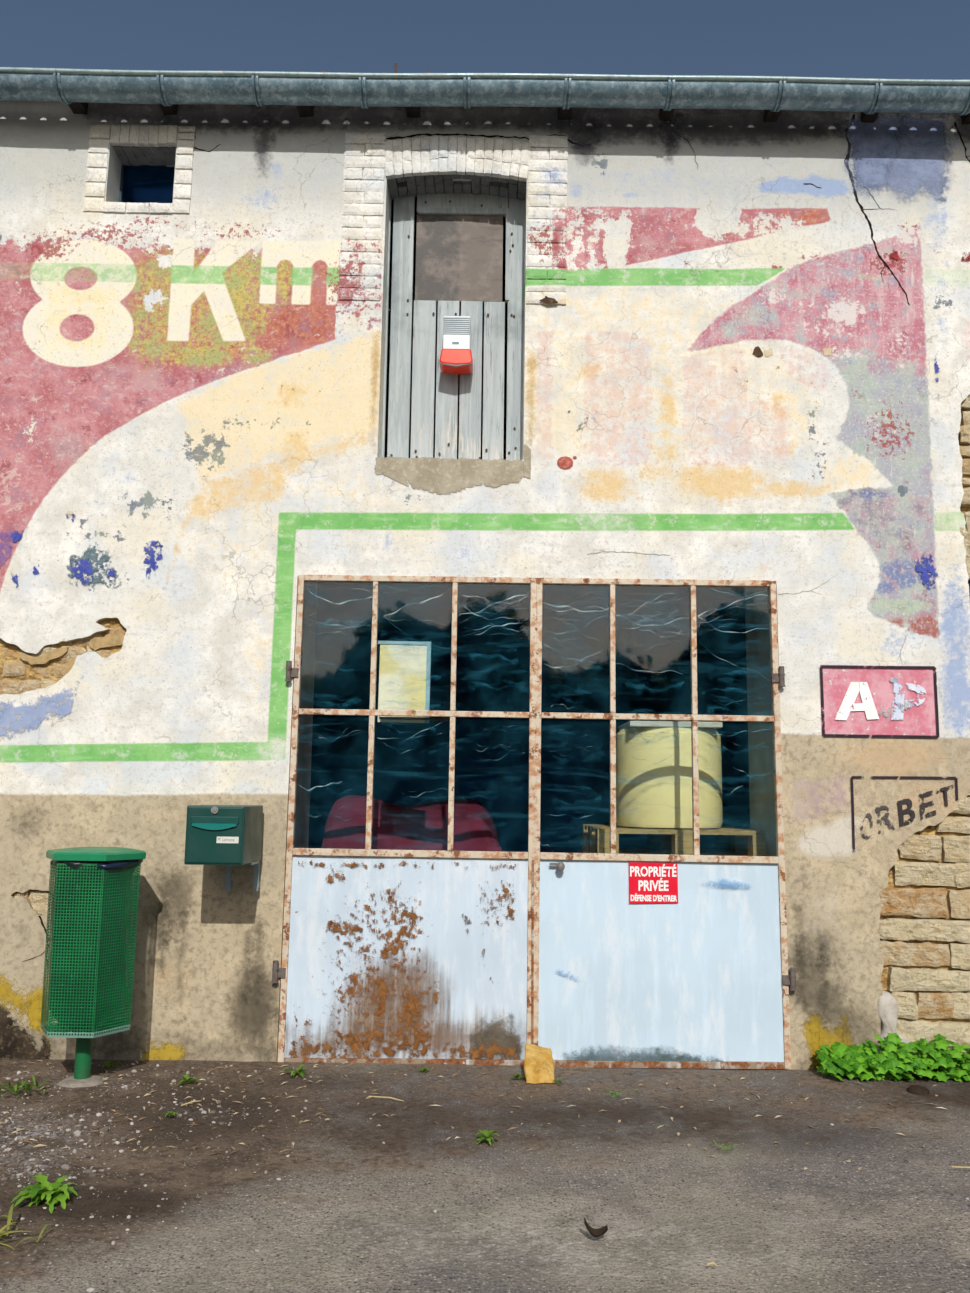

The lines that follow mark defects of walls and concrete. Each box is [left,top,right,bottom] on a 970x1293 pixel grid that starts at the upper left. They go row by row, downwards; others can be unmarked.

leakage [89,105,845,163]
crack [954,122,970,162]
crack [803,114,910,305]
flaking render [958,395,970,580]
flaking render [0,619,127,739]
flaking render [13,890,52,914]
corrosion [289,861,521,1060]
flaking render [877,791,970,1055]
leakage [0,1005,51,1060]